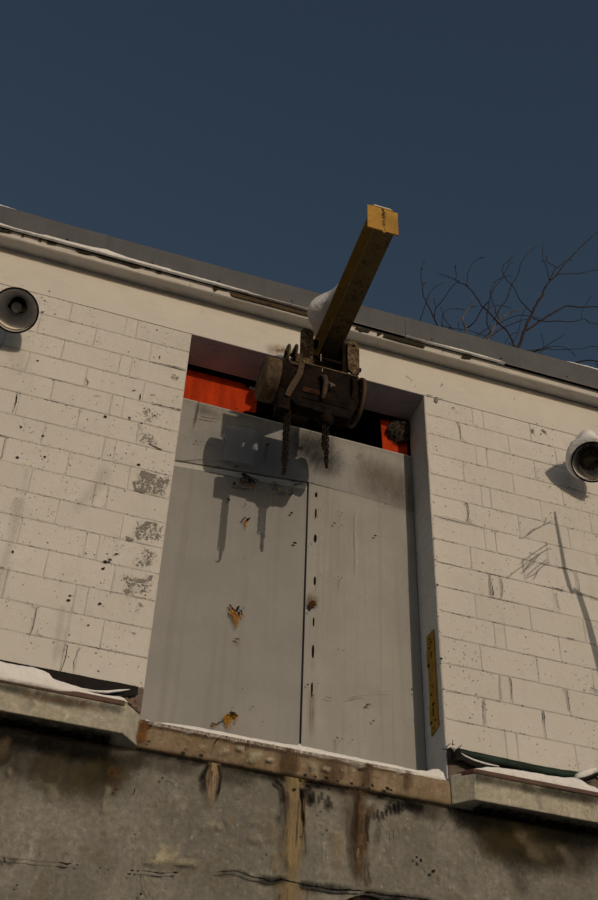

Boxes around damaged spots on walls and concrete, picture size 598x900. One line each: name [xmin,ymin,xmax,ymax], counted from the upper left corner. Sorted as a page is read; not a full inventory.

peeling [133,463,171,496]
peeling [124,521,165,611]
crack [3,857,178,895]
crack [219,870,431,900]